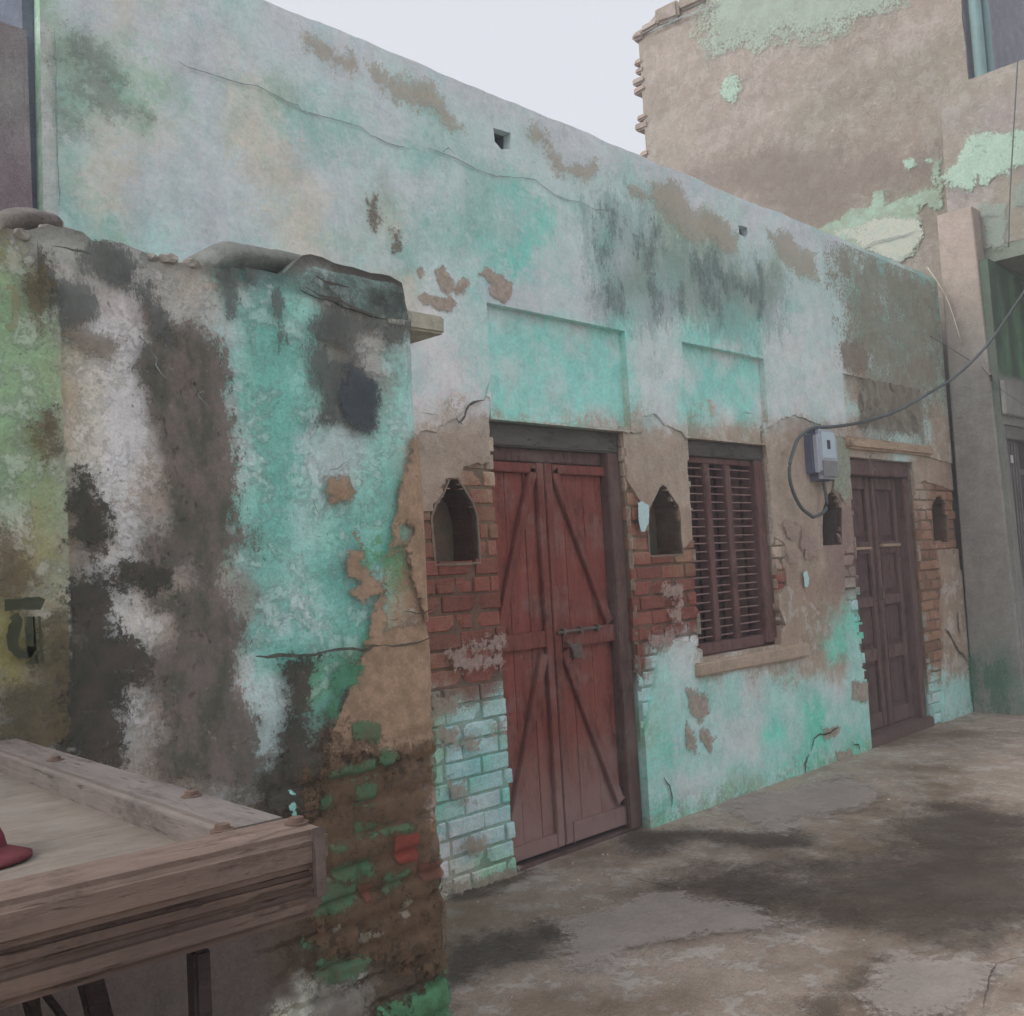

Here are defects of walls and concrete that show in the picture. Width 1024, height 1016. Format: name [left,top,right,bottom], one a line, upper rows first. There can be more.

crack [180,62,632,222]
peeling [417,265,513,313]
flaking render [760,226,960,724]
leakage [0,237,568,989]
crack [256,609,433,659]
flaking render [311,396,524,934]
spalling [617,414,699,742]
spalling [685,687,718,756]
crack [805,727,861,773]
leakage [618,801,1024,954]
peeling [292,931,384,985]